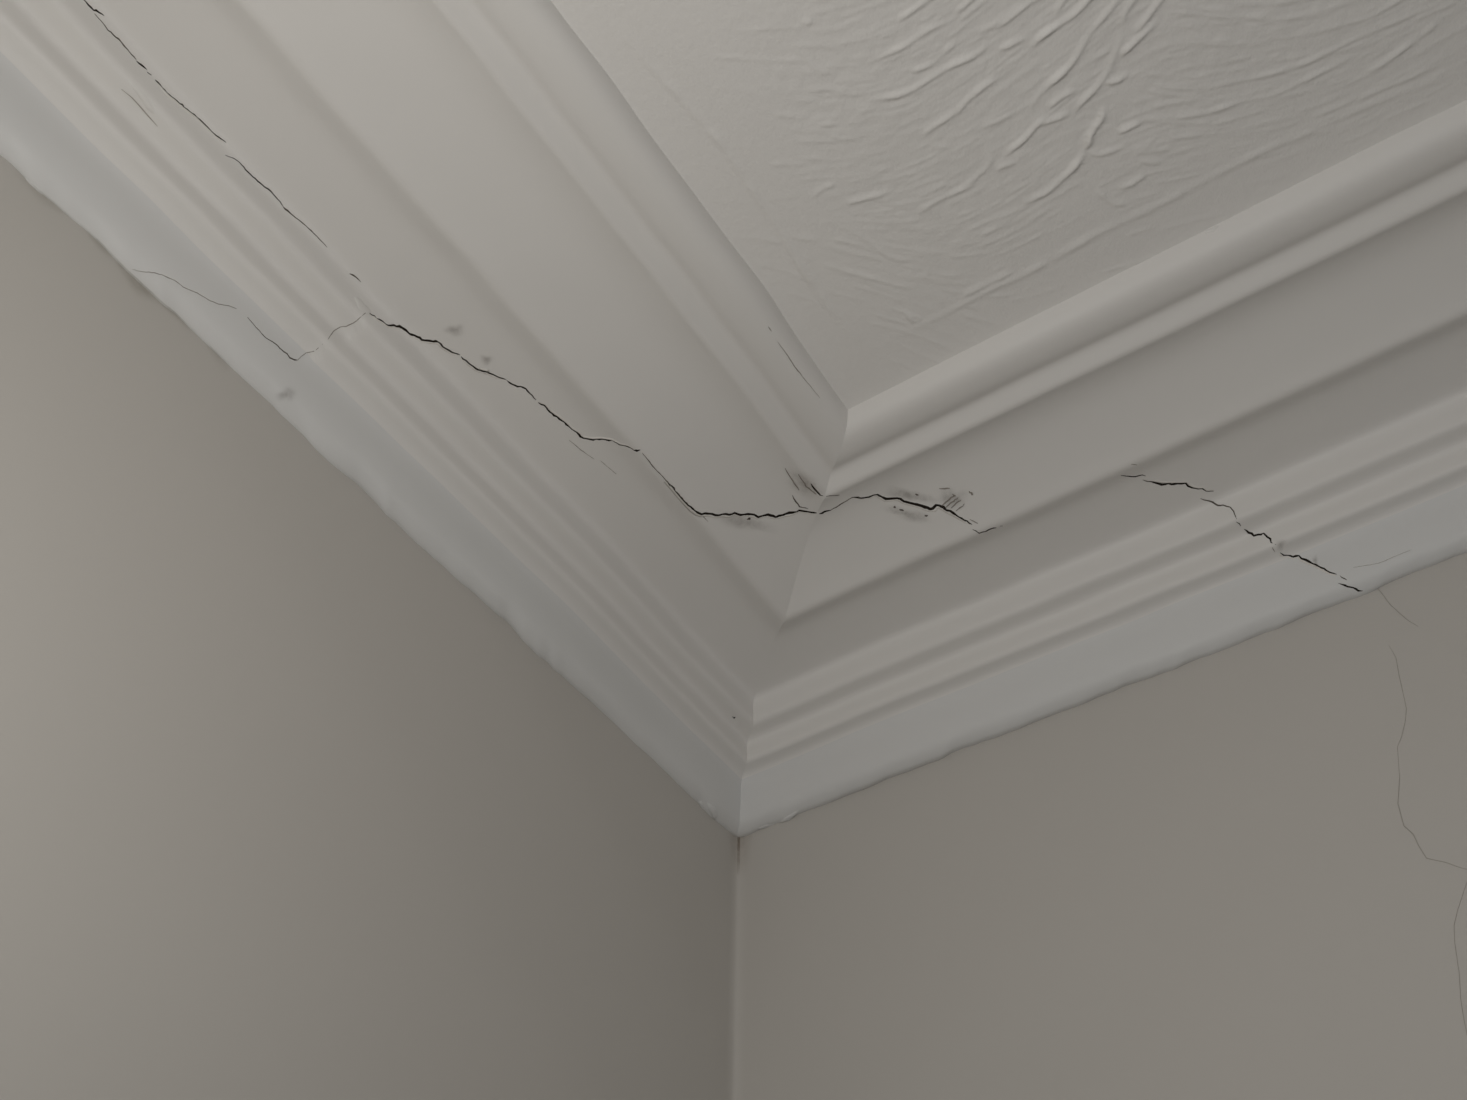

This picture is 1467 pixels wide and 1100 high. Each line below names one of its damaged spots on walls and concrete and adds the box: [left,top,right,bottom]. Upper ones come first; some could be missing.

crack [84,0,327,247]
crack [133,269,994,534]
crack [1121,464,1467,1033]